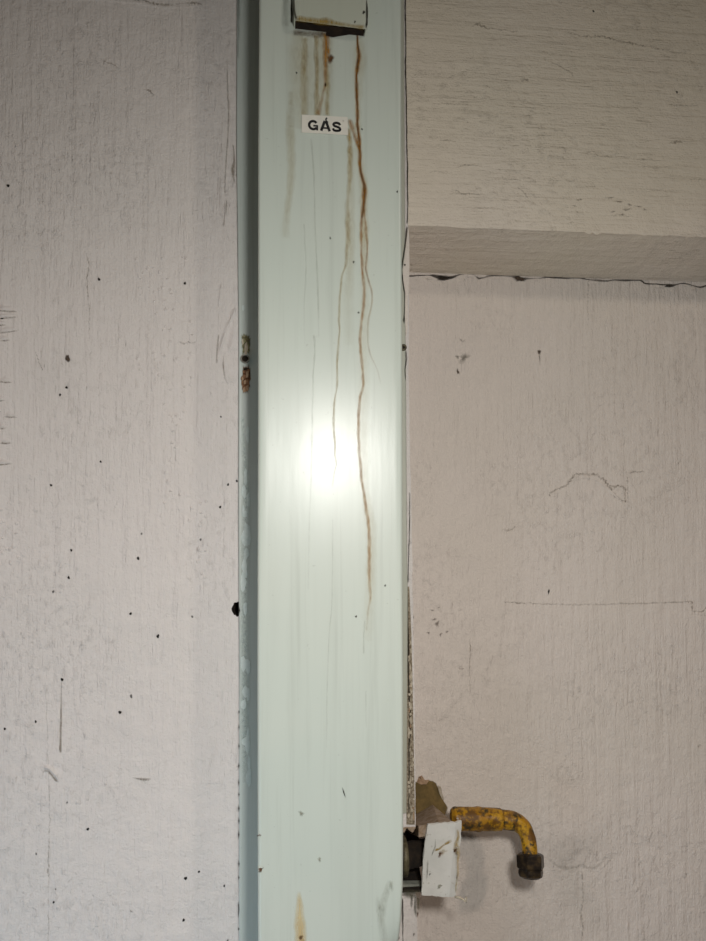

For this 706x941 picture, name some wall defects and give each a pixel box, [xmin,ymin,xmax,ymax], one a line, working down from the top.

corrosion [299,17,342,66]
corrosion [348,36,366,240]
crack [409,274,706,290]
corrosion [242,335,250,354]
corrosion [241,367,251,392]